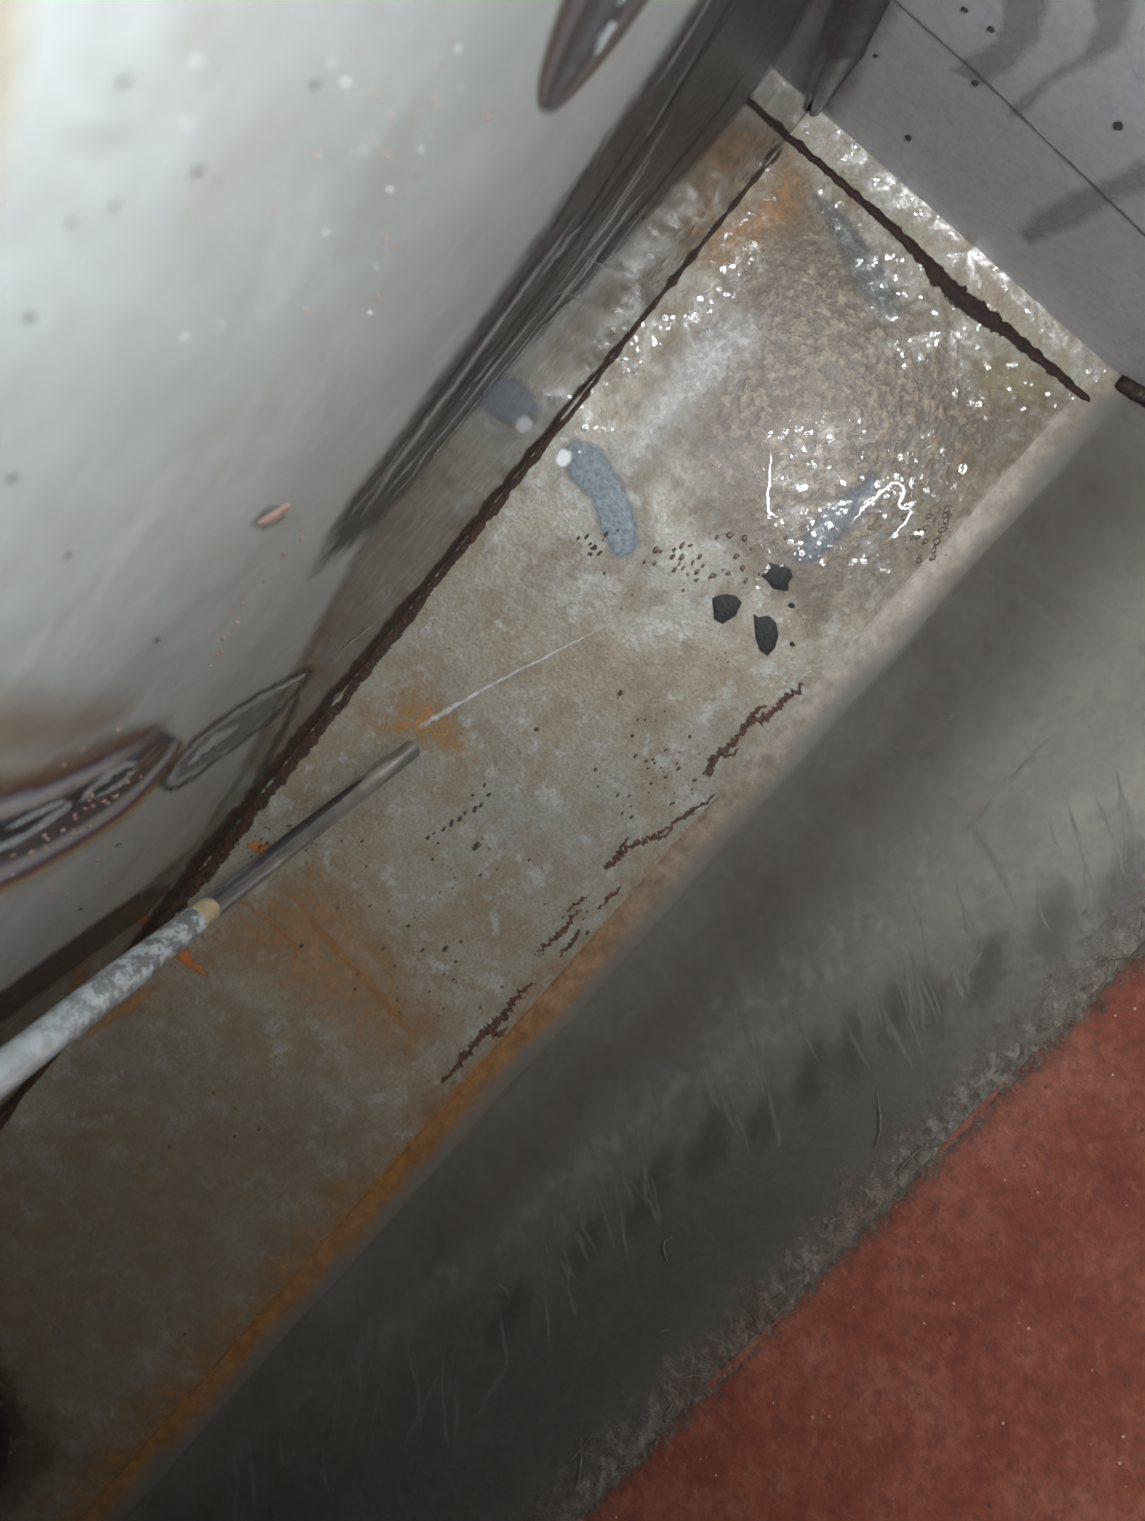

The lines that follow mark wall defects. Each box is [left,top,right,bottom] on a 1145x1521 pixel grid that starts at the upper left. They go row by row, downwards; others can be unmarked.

water stain [0,0,852,1048]
crack [145,135,1091,938]
crack [441,682,803,1082]
water stain [0,1070,39,1118]
crack [0,1052,61,1130]